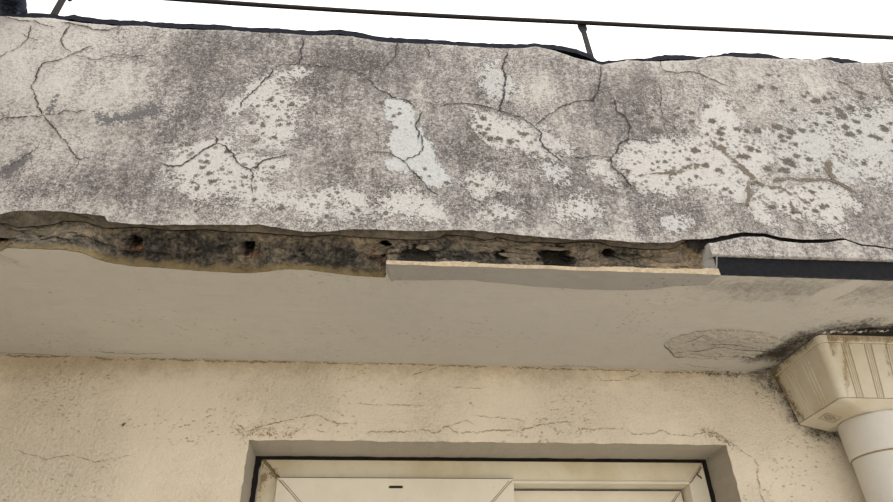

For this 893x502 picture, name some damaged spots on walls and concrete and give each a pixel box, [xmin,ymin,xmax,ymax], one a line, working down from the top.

crack [0,15,144,170]
crack [240,38,700,195]
crack [658,59,727,115]
crack [839,65,893,101]
crack [163,137,292,193]
spalling [0,48,893,290]
crack [708,138,855,213]
crack [685,232,893,250]
damp [734,318,893,422]